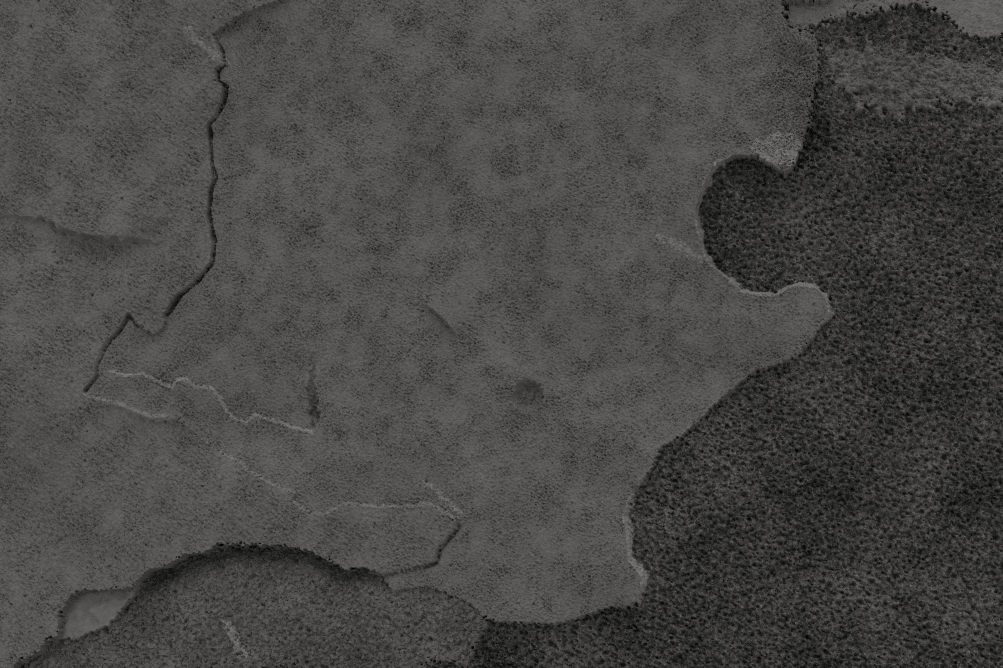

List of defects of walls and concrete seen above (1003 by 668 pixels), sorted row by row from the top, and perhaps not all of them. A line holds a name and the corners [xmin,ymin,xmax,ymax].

crack [182,26,230,67]
spalling [10,541,494,668]
spalling [86,0,828,628]
spalling [470,0,1003,668]